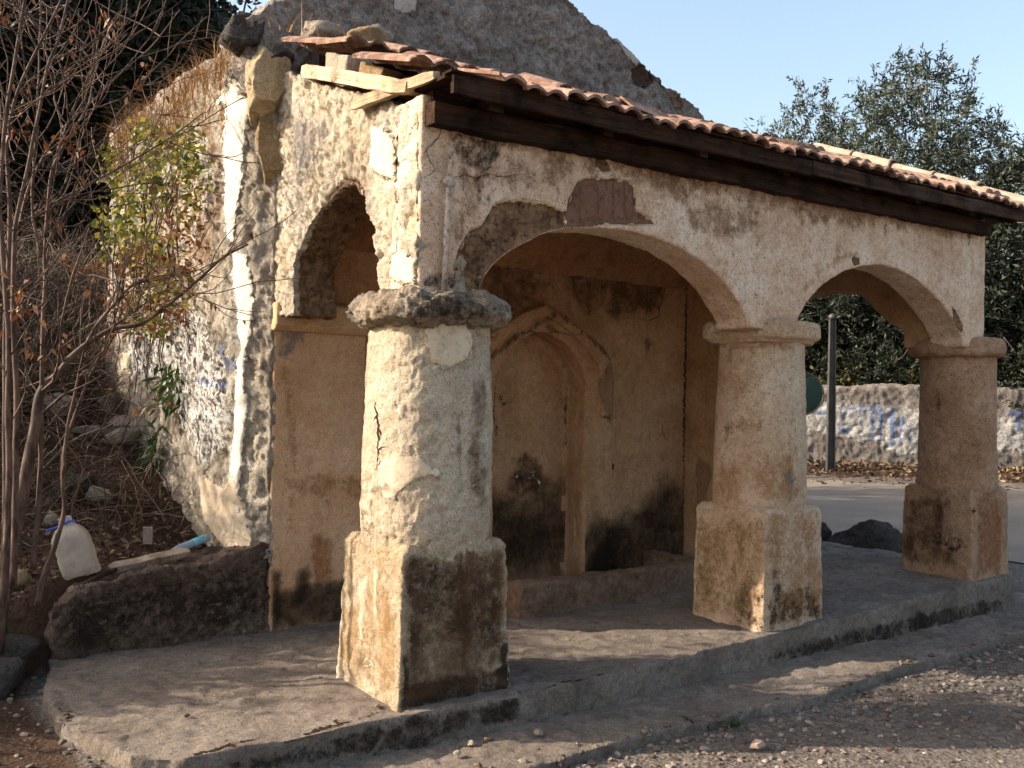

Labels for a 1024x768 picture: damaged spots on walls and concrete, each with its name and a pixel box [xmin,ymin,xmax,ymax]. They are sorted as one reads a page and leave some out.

spalling [454,159,654,290]
peeling [424,323,473,369]
crack [374,405,385,470]
peeling [377,453,441,501]
leakage [585,487,684,572]
leakage [903,498,966,560]
leakage [232,436,566,768]
leakage [694,519,820,631]
leakage [771,600,1002,658]